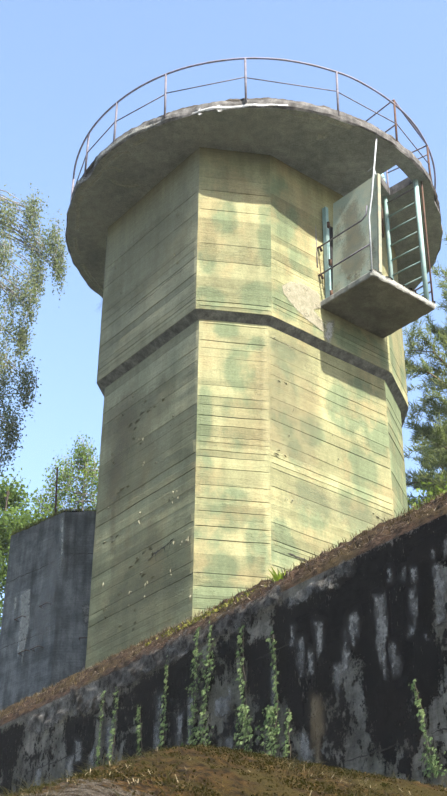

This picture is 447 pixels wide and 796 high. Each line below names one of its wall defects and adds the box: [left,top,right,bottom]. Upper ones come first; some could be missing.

water stain [0,514,447,796]